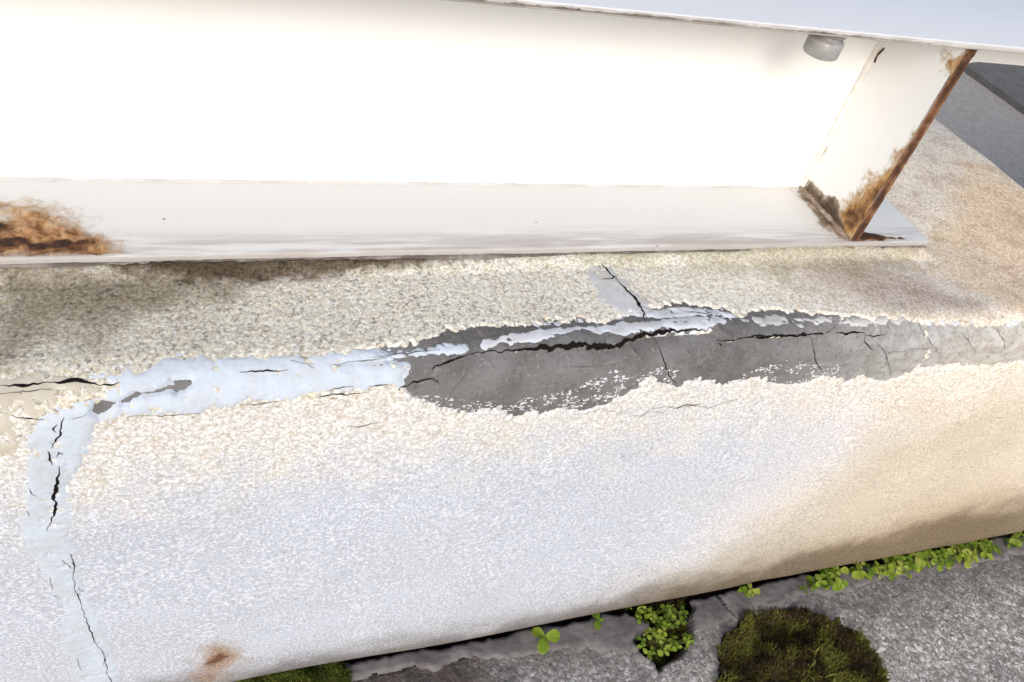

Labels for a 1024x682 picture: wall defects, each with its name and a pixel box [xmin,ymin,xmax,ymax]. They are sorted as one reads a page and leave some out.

rust [798,49,977,241]
rust [0,202,121,257]
crack [248,360,313,372]
crack [316,262,939,416]
crack [0,378,120,531]
spalling [0,267,1024,682]
crack [50,554,112,682]